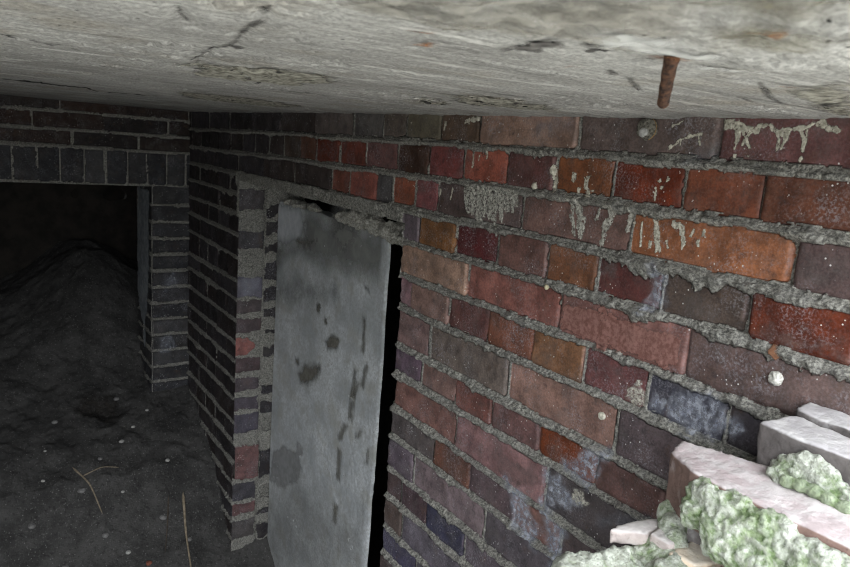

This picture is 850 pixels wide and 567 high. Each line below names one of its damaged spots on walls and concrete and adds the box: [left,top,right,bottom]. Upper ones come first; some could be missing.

crack [191,5,272,61]
efflorescence [724,119,842,163]
efflorescence [549,164,558,193]
efflorescence [565,172,616,247]
efflorescence [625,204,669,253]
efflorescence [671,220,706,250]
damp [326,336,339,349]
damp [296,359,320,384]
damp [336,365,368,480]
damp [270,442,303,486]